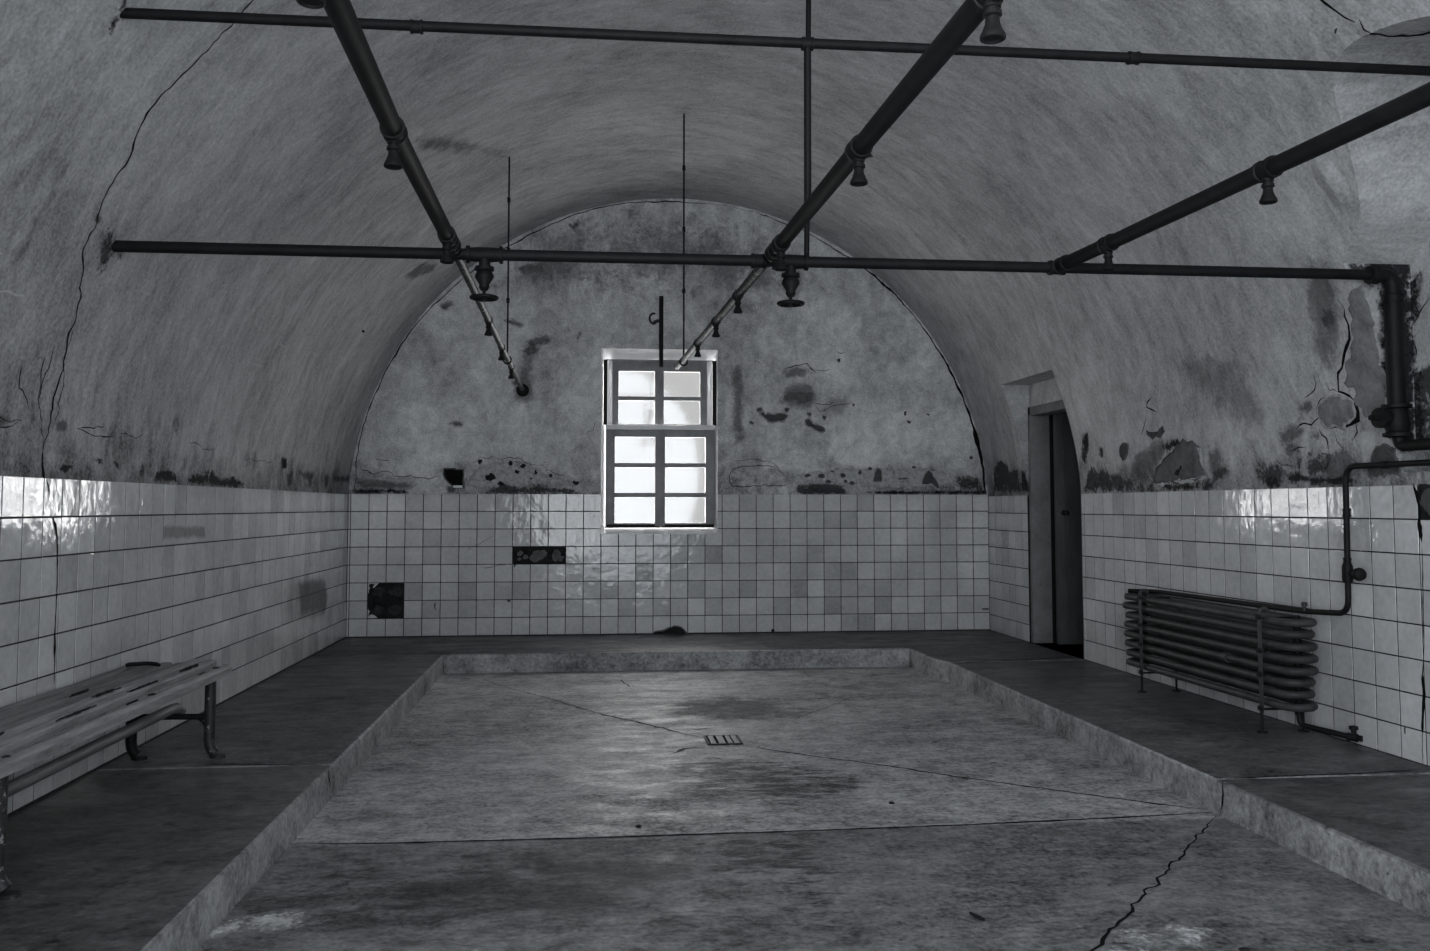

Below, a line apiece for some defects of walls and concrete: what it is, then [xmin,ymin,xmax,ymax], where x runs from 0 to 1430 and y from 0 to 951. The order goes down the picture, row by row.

crack [1320,0,1430,37]
crack [19,0,253,682]
spalling [1275,285,1401,479]
damp [1369,264,1430,452]
peeling [361,457,579,489]
peeling [729,459,962,490]
spalling [1146,426,1207,486]
peeling [1419,484,1430,520]
peeling [513,546,566,568]
peeling [367,583,404,619]
crack [479,677,726,753]
crack [751,746,1224,951]